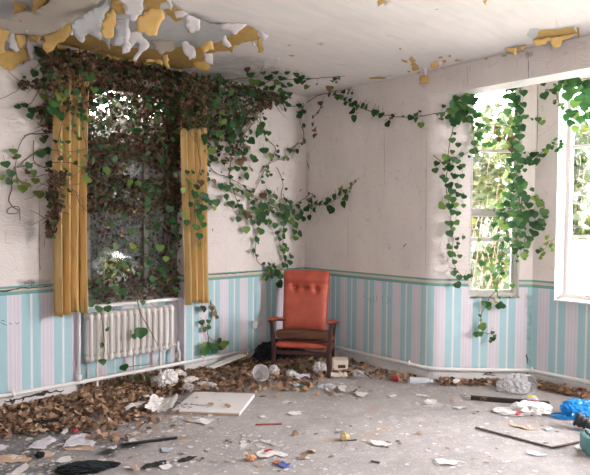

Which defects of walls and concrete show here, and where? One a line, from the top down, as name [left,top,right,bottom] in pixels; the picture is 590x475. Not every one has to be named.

peeling [0,0,269,71]
peeling [502,25,585,57]
peeling [401,48,463,88]
crack [5,390,64,404]